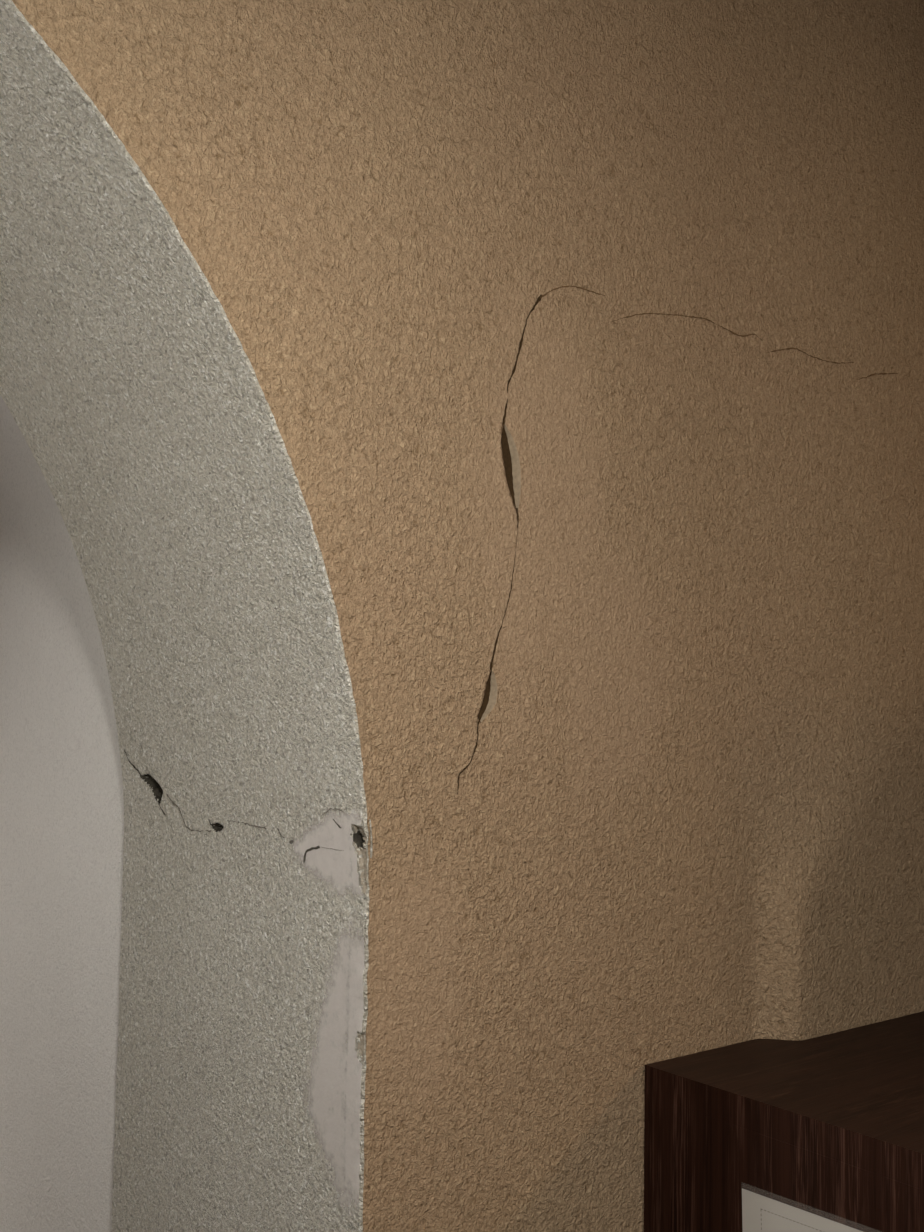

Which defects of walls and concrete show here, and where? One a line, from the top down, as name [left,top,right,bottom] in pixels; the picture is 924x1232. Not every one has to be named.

crack [457,286,898,795]
crack [124,750,356,862]
flaking render [353,820,373,894]